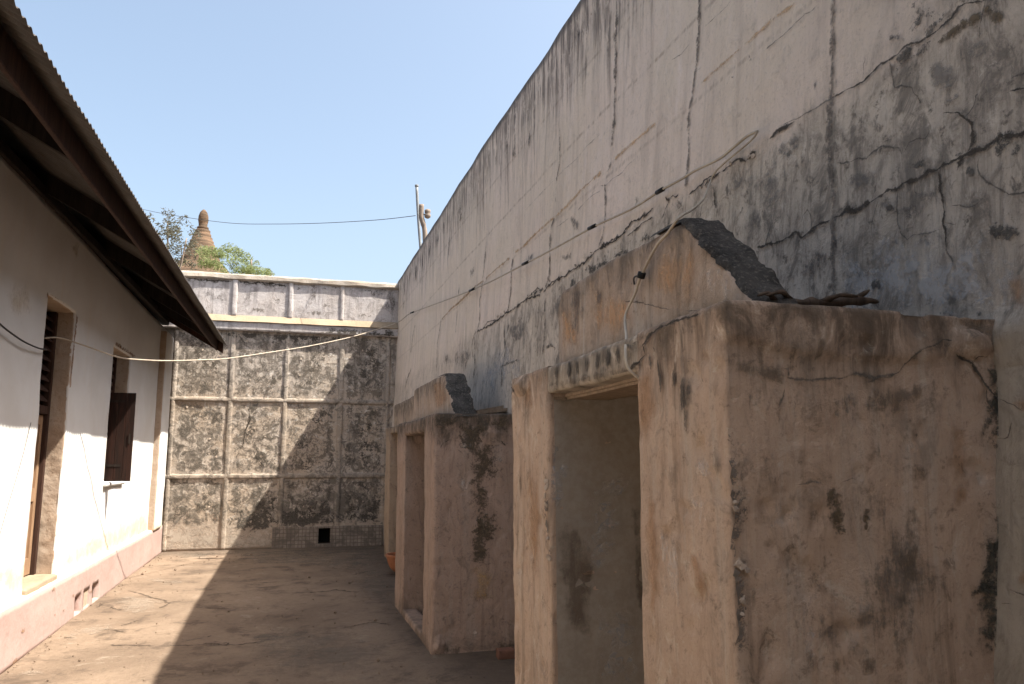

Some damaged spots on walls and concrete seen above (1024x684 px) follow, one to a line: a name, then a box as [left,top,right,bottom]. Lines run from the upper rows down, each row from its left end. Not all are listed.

leakage [889,0,1003,70]
crack [674,0,729,208]
crack [758,0,1024,295]
spalling [477,150,756,332]
crack [501,259,517,392]
leakage [649,356,690,427]
crack [779,339,1021,439]
leakage [983,369,999,446]
leakage [438,415,507,562]
leakage [554,396,644,684]
leakage [827,489,845,534]
leakage [973,519,999,650]